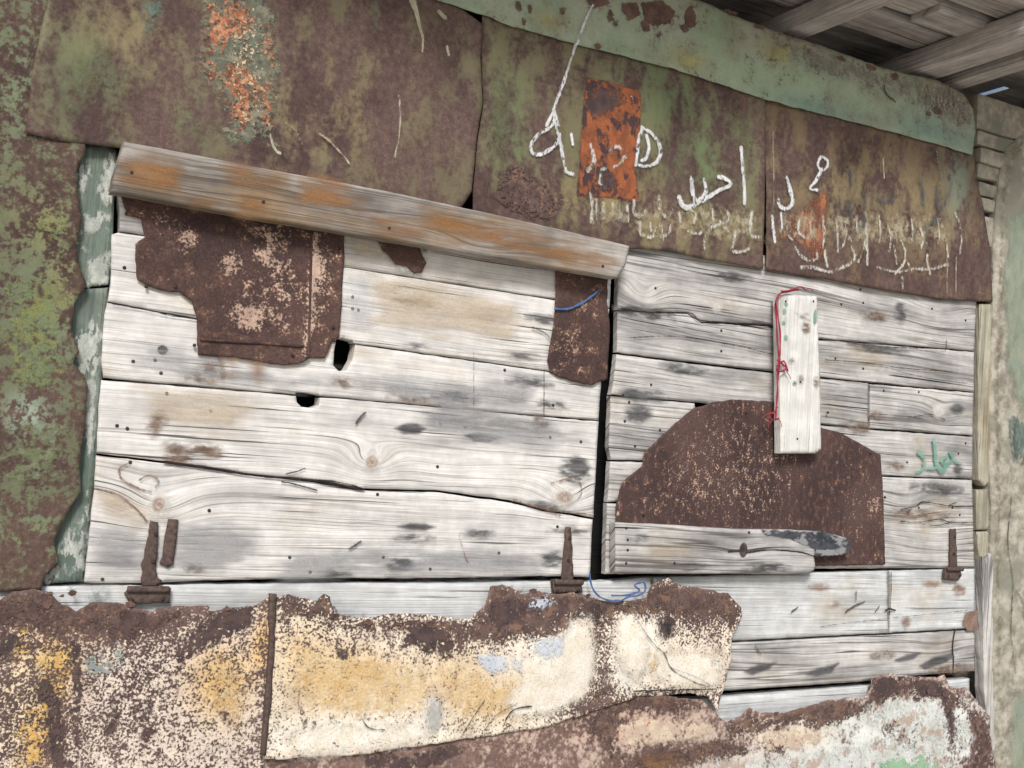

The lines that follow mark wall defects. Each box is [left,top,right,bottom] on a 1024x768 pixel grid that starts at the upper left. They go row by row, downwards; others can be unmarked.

corrosion [199,0,281,155]
corrosion [126,163,178,187]
corrosion [301,182,350,205]
corrosion [428,214,575,258]
corrosion [494,163,562,223]
corrosion [577,79,641,202]
corrosion [779,191,828,260]
crack [97,461,365,522]
crack [513,478,591,516]
corrosion [0,590,186,768]
corrosion [174,605,256,694]
corrosion [278,587,993,768]